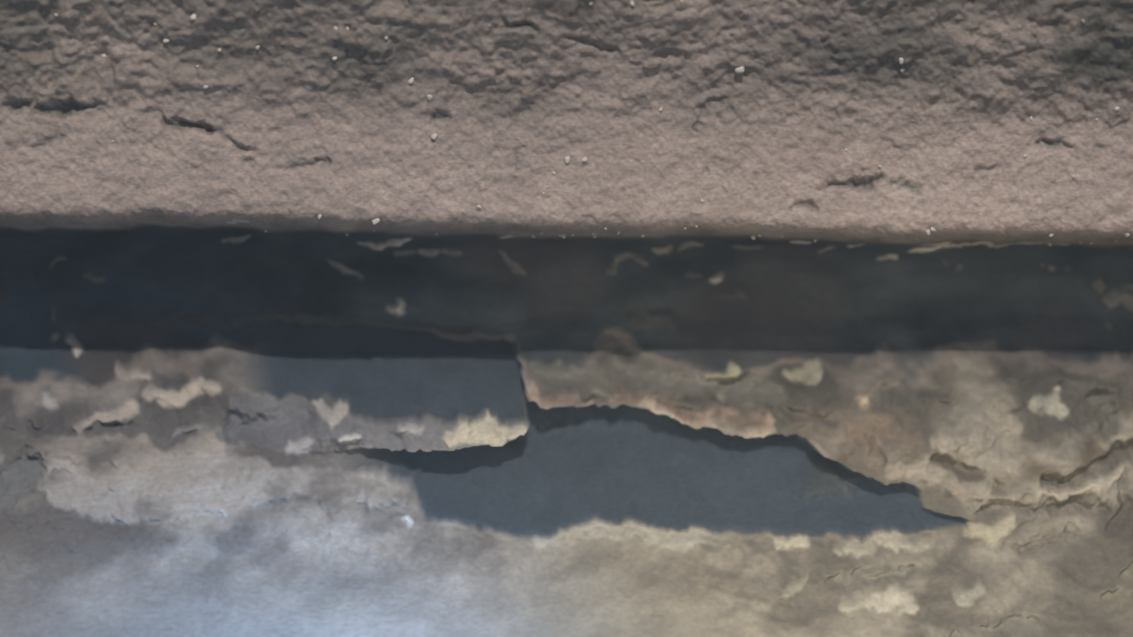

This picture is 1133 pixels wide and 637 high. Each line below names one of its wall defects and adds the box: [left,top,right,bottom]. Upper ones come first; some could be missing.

spalling [0,322,1133,637]
crack [977,441,1133,557]